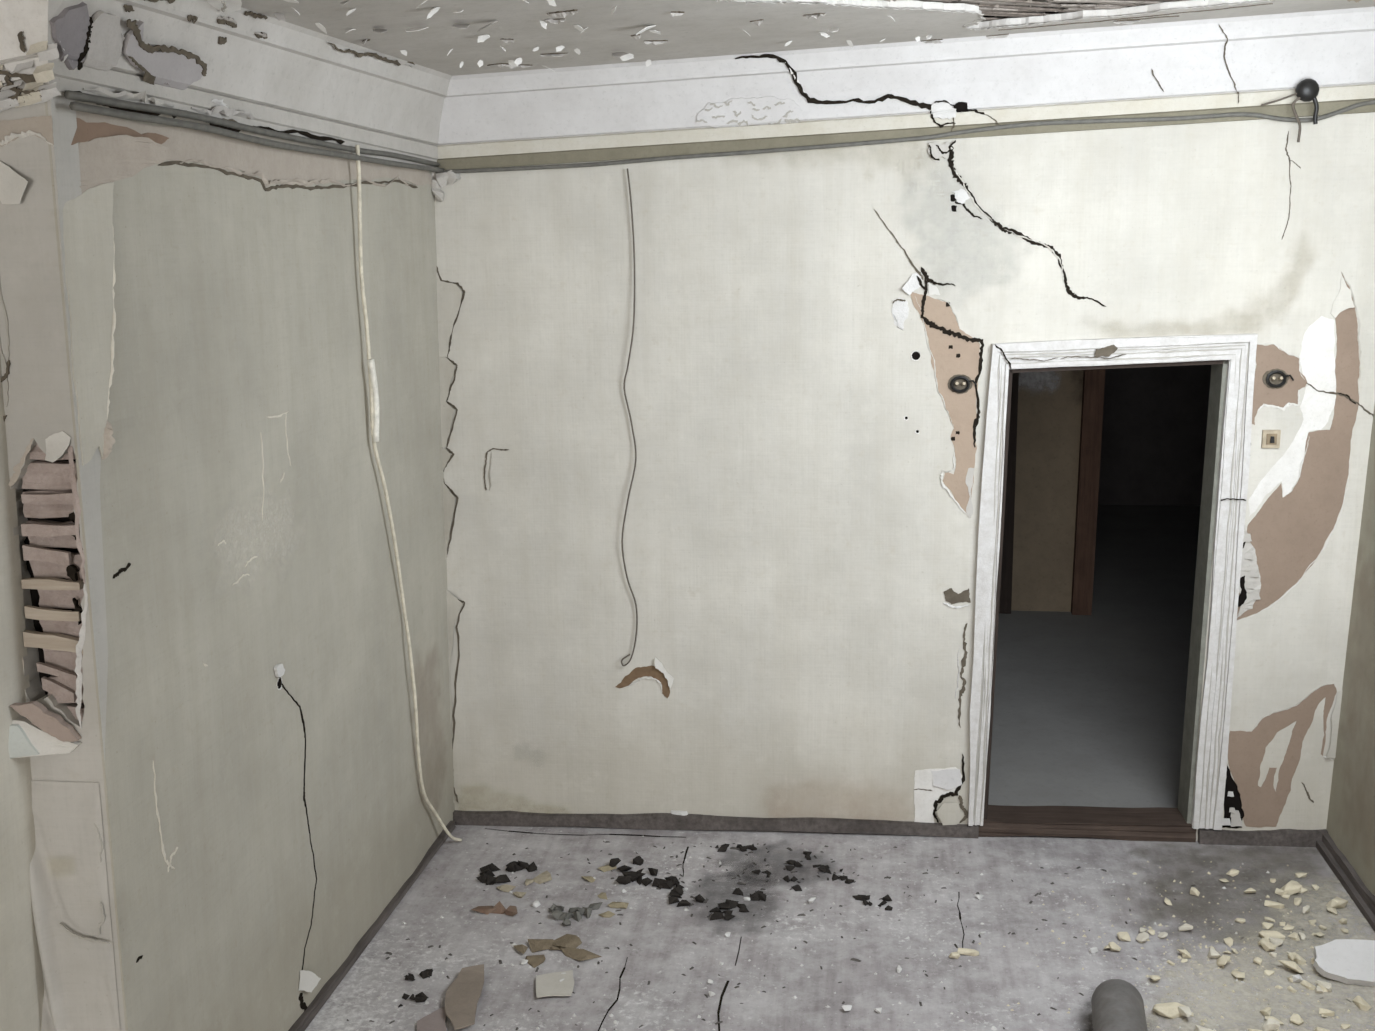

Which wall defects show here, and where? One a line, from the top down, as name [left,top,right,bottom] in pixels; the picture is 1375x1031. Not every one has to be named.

peeling [406,0,588,72]
peeling [612,25,668,66]
peeling [803,13,853,48]
crack [735,54,999,125]
peeling [915,35,943,44]
crack [875,211,1056,369]
crack [947,146,1106,307]
crack [1282,131,1301,239]
peeling [892,292,984,518]
peeling [1237,272,1362,620]
flaking render [9,431,88,728]
peeling [1222,684,1343,829]